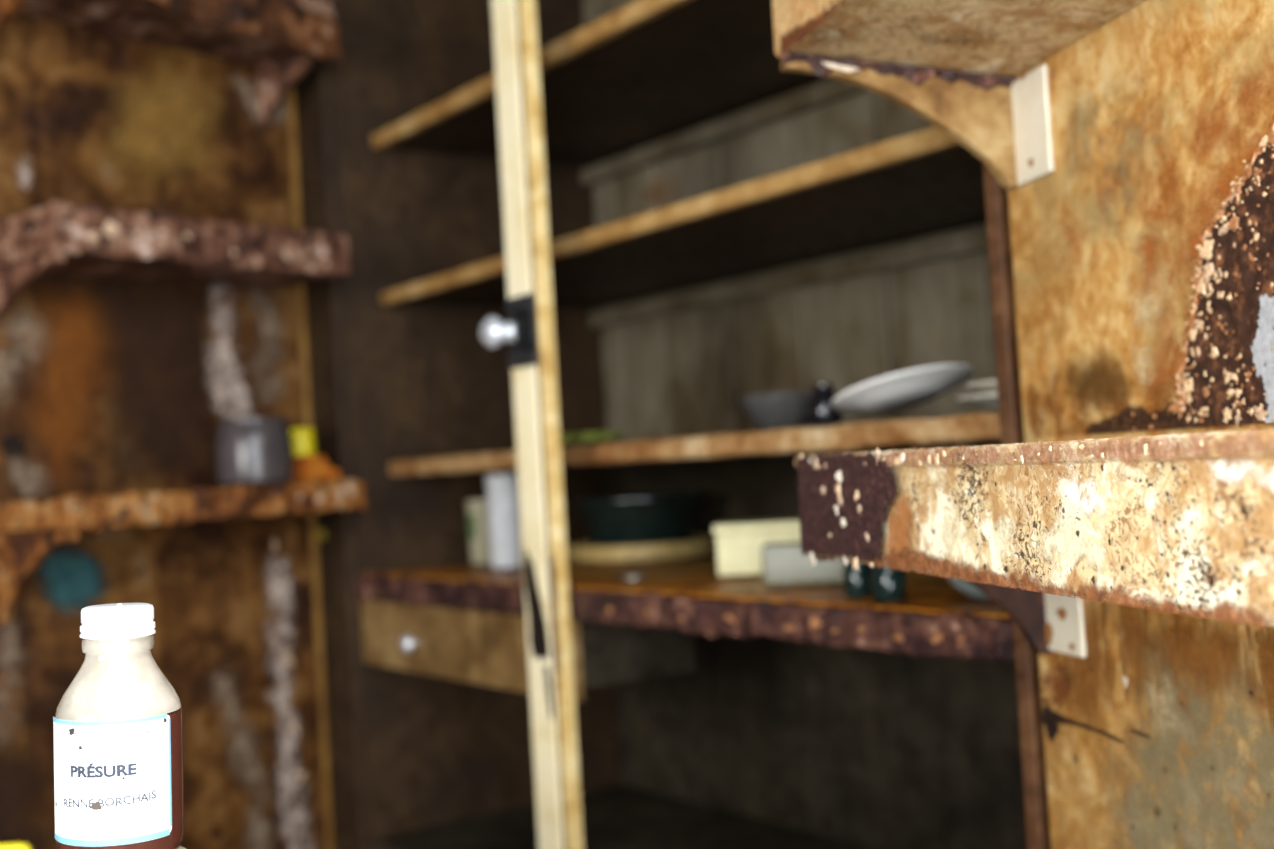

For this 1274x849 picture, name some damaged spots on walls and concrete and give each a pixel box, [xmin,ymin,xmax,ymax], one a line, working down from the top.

corrosion [1084,124,1274,435]
corrosion [1041,602,1274,718]